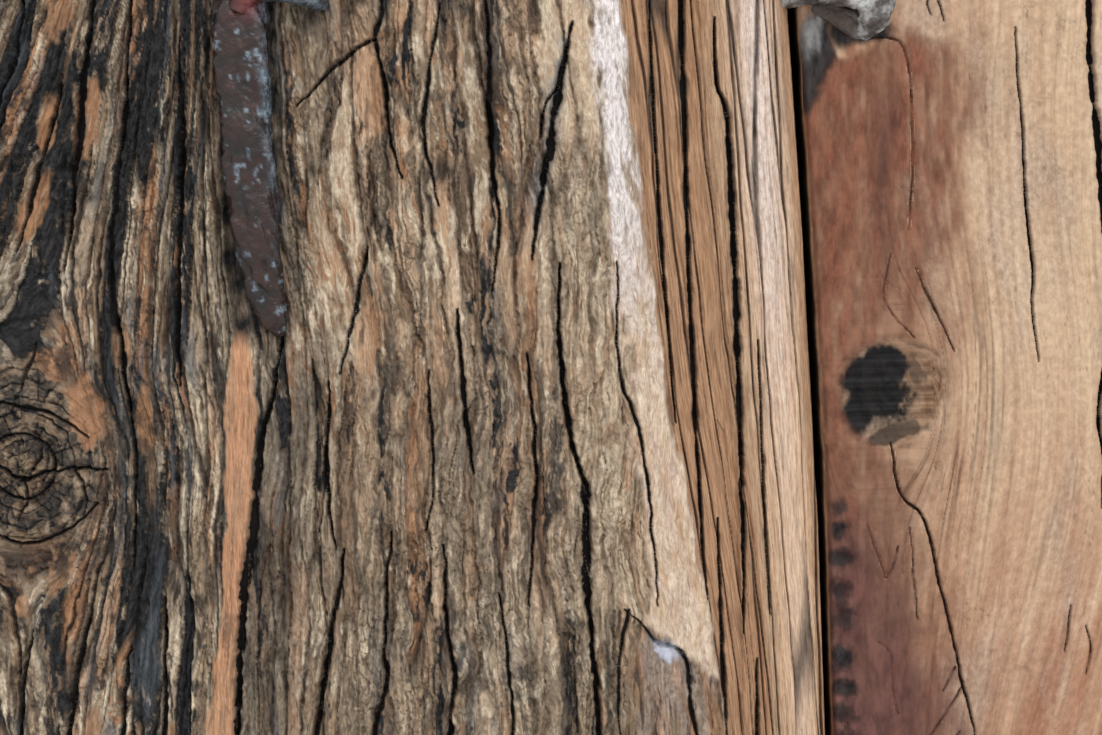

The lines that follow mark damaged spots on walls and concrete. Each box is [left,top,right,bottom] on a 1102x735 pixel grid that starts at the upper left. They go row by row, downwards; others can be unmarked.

crack [0,345,107,543]
crack [17,0,96,259]
crack [109,0,139,567]
crack [161,600,169,735]
crack [498,354,539,735]
crack [531,23,573,259]
crack [556,263,601,735]
crack [648,0,770,735]
crack [870,444,975,735]
crack [1014,31,1038,356]
crack [1085,0,1102,233]
crack [1094,368,1102,455]